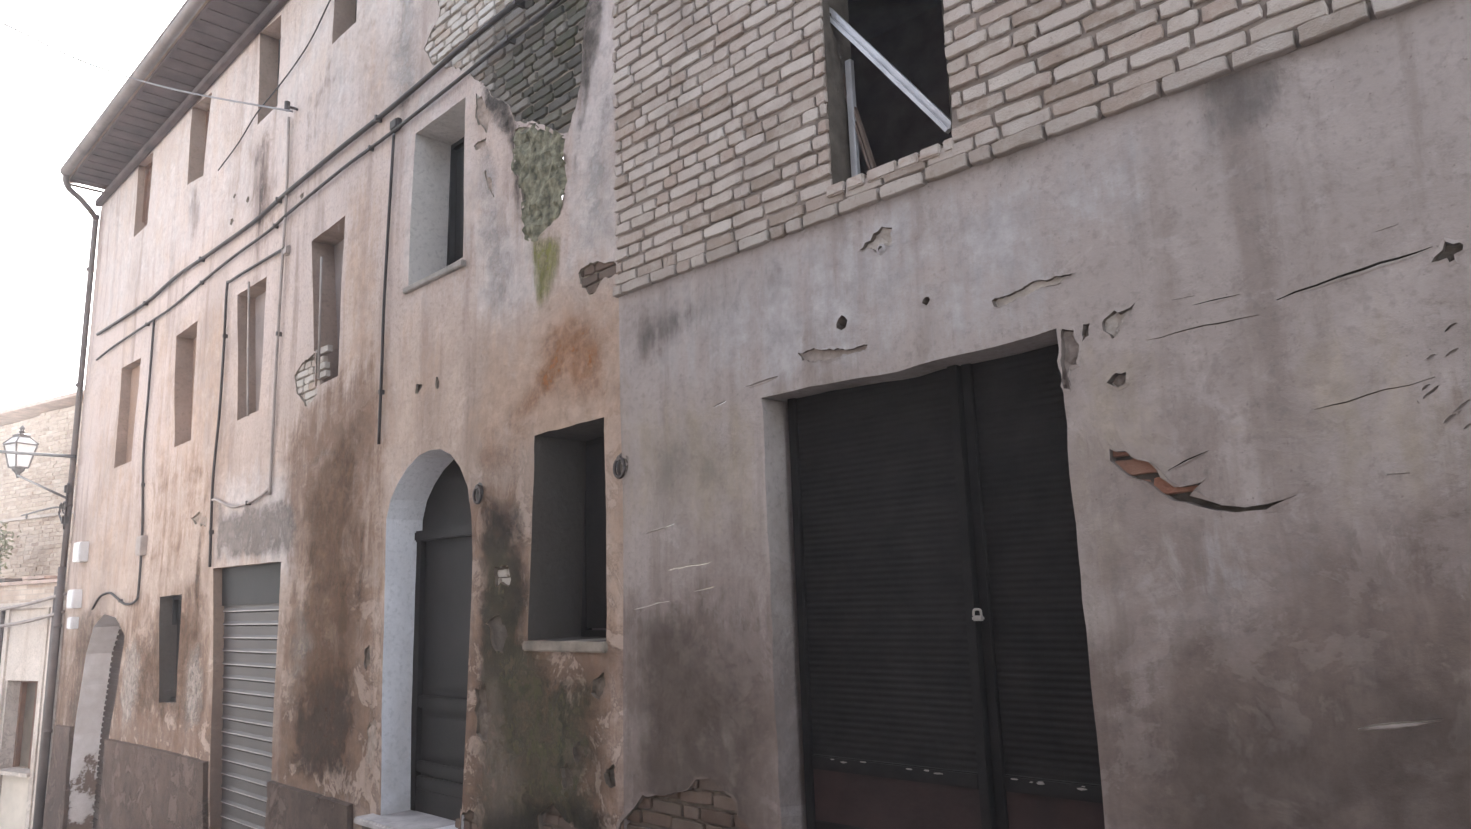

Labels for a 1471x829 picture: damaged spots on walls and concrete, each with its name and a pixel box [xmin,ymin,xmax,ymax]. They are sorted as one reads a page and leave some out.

damp [485,88,514,149]
flaking render [423,0,592,243]
damp [533,239,557,298]
flaking render [989,272,1076,309]
crack [1193,294,1240,306]
crack [1276,247,1432,302]
flaking render [1426,237,1469,267]
flaking render [294,344,333,408]
flaking render [1057,300,1138,393]
crack [1169,450,1209,471]
damp [295,443,362,773]
damp [481,505,526,699]